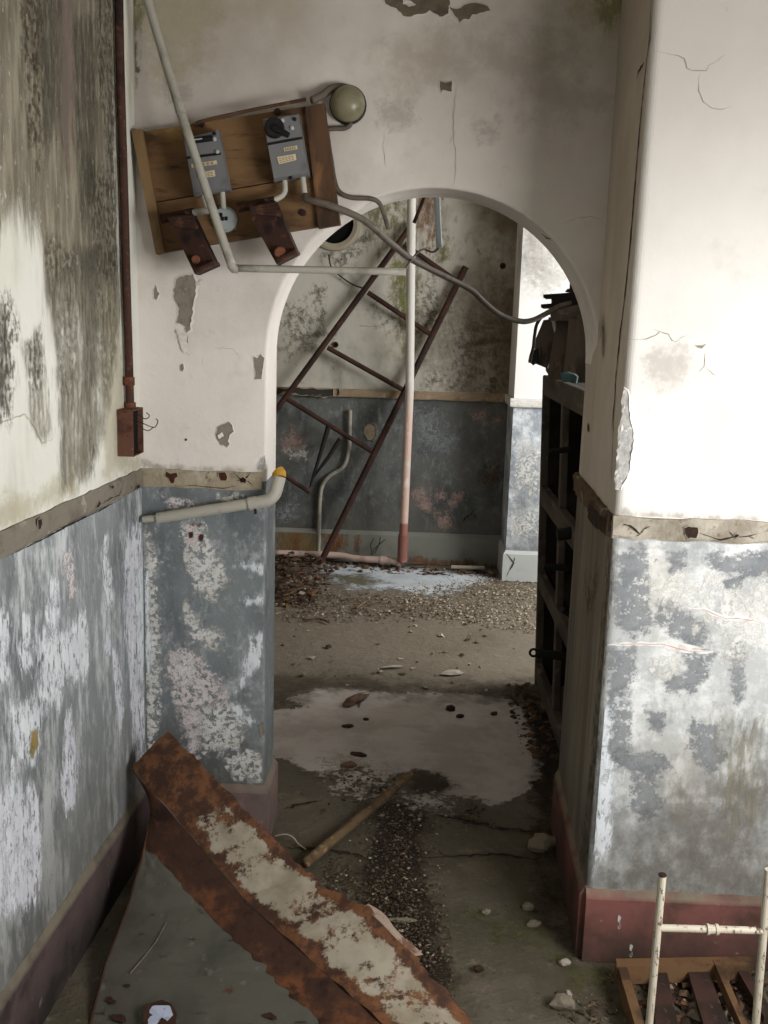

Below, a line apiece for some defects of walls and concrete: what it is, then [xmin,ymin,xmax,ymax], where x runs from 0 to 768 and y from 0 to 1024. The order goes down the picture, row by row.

peeling [382,0,492,24]
flaking render [437,80,454,94]
damp [0,0,122,486]
crack [611,12,728,475]
peeling [152,273,203,372]
peeling [252,353,265,380]
peeling [215,421,235,449]
peeling [614,387,635,490]
damp [609,560,768,680]
damp [0,496,263,922]
crack [421,809,547,860]
efflorescence [592,700,620,871]